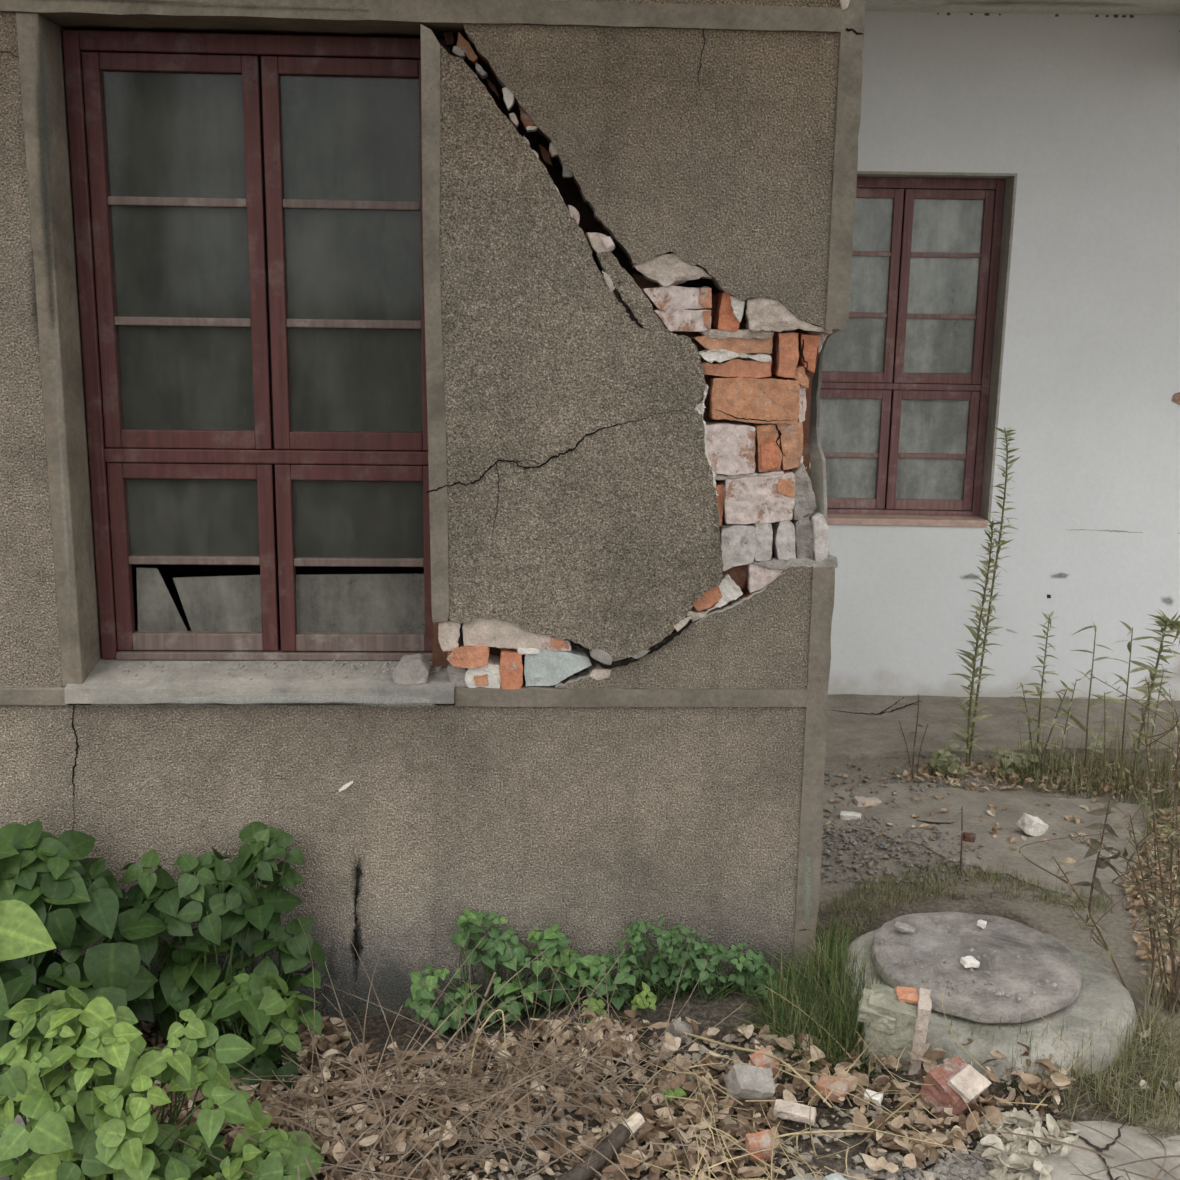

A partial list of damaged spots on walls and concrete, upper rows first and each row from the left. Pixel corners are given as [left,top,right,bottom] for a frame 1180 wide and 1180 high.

crack [426,409,685,533]
spalling [632,253,838,622]
spalling [432,617,613,689]
crack [71,706,79,830]
leakage [351,867,363,966]